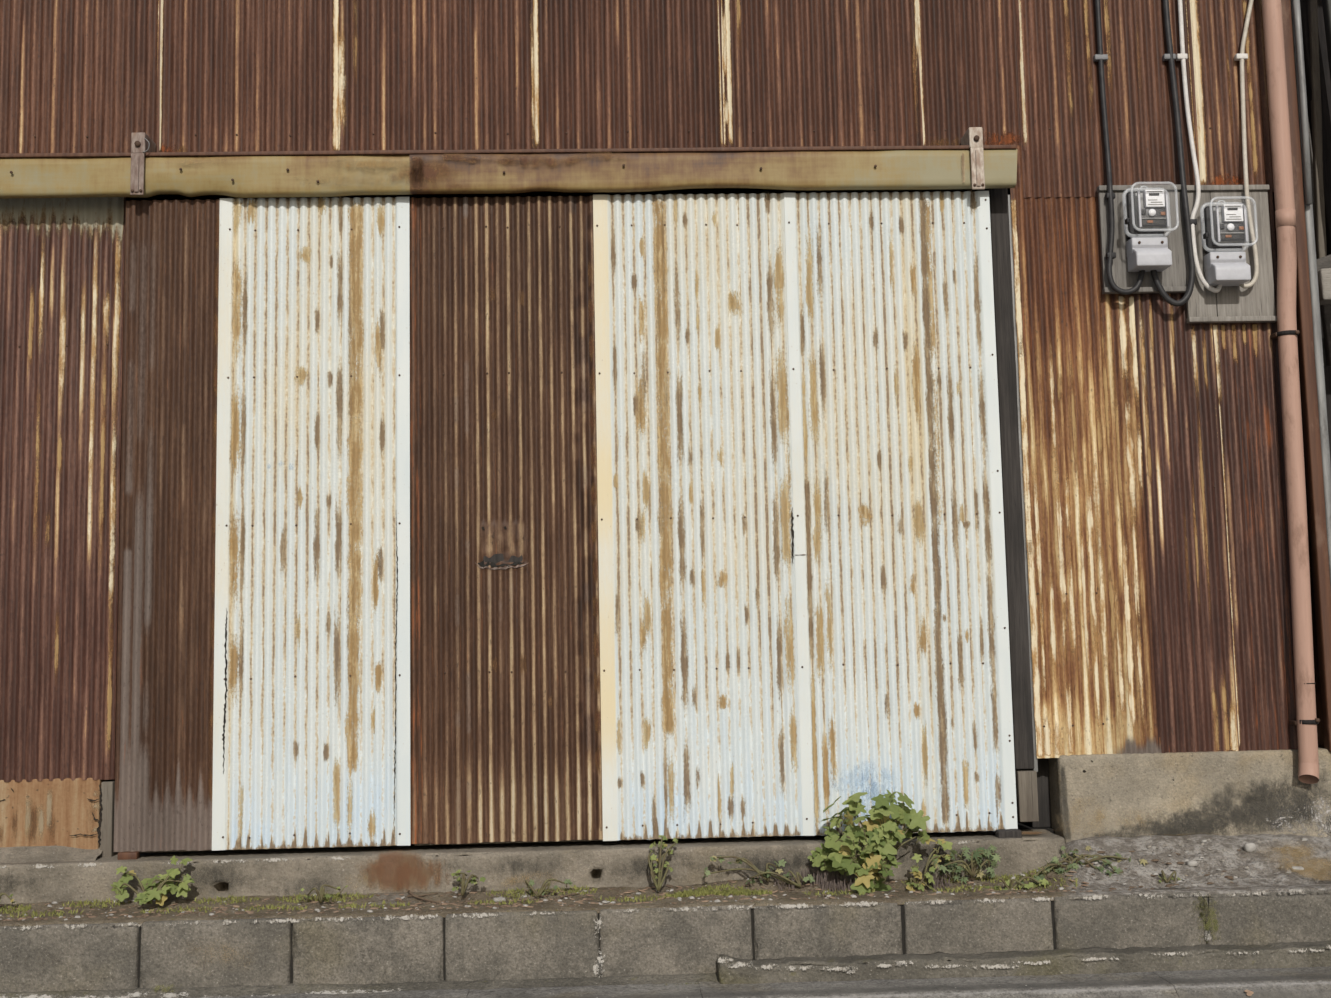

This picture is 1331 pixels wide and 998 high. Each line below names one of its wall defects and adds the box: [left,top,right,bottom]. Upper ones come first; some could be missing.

rust [216,199,256,248]
rust [214,264,248,358]
rust [213,393,246,496]
rust [212,512,245,596]
rust [233,196,440,890]
rust [620,197,844,840]
rust [858,504,872,525]
rust [889,192,1004,833]
rust [210,621,244,698]
rust [0,810,54,842]
leakage [1095,783,1325,837]